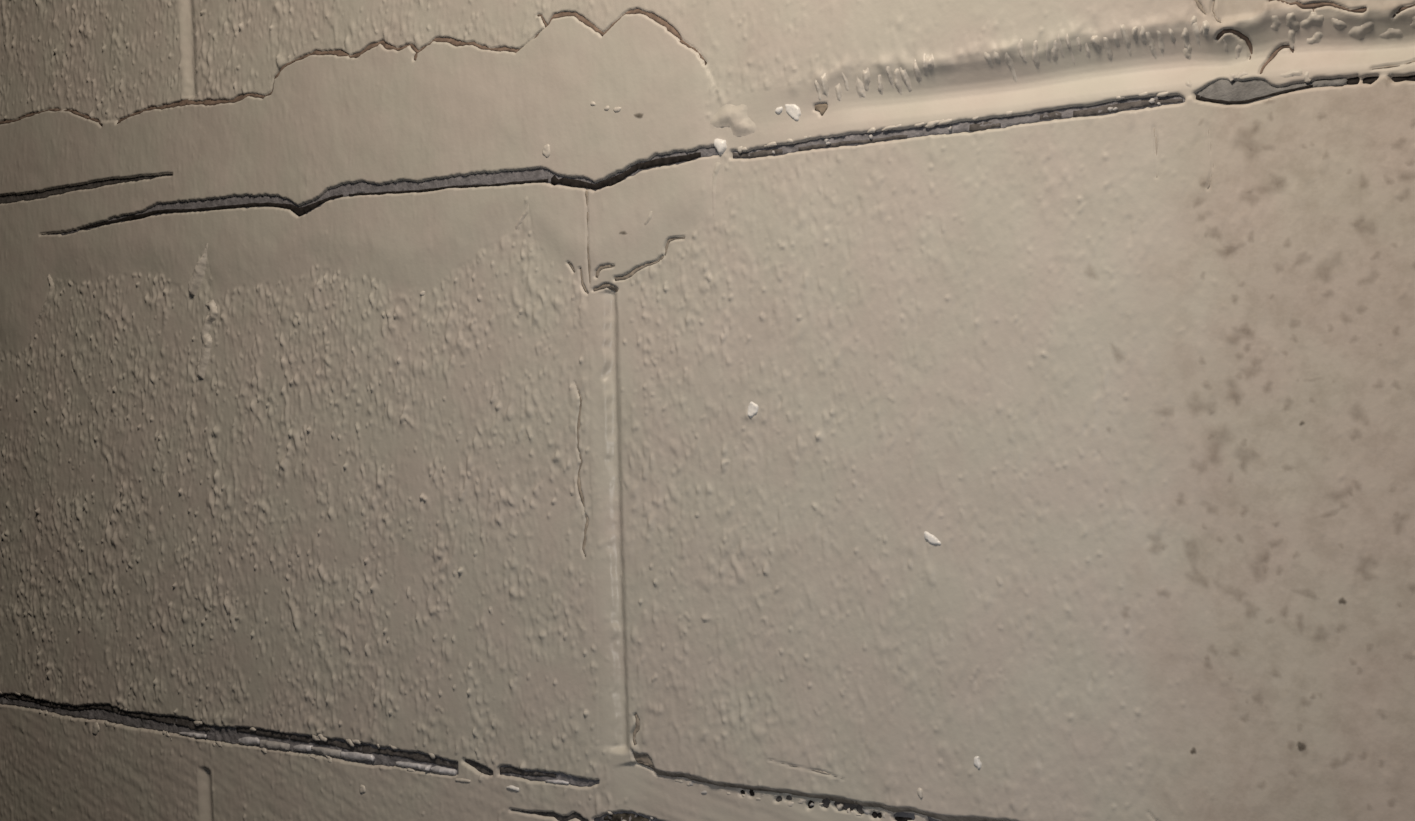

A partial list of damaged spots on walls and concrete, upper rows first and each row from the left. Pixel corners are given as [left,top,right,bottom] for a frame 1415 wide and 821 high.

crack [0,91,1185,294]
crack [0,691,661,821]
crack [633,713,1010,821]